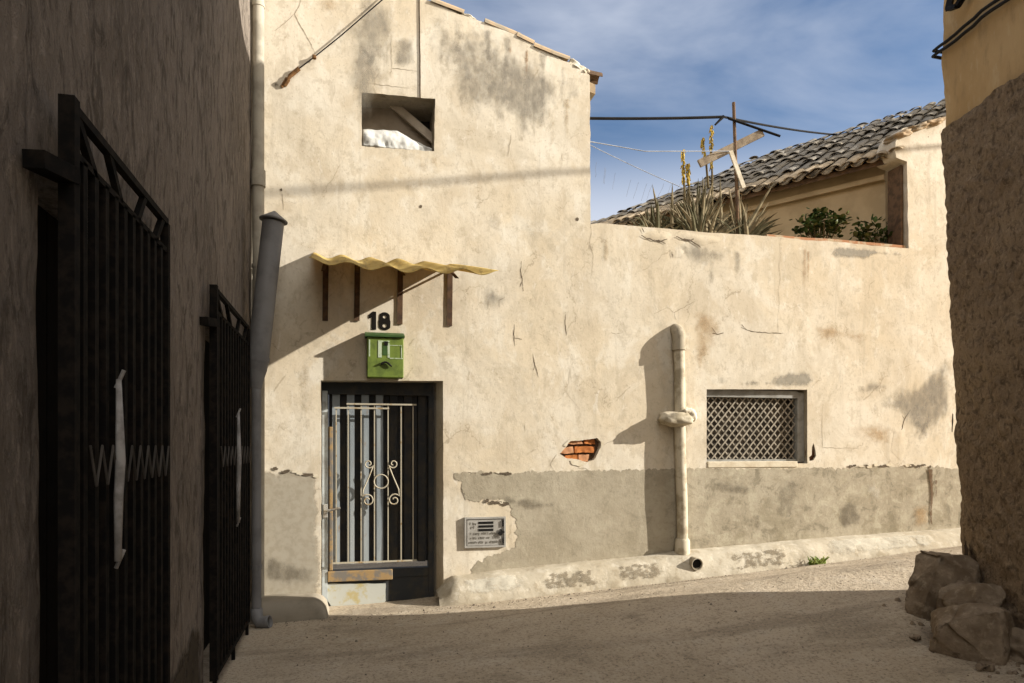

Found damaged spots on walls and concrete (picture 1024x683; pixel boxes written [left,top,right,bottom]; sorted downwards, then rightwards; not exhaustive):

damp [456,46,549,116]
crack [641,228,701,256]
damp [898,372,946,427]
flaking render [560,438,604,467]
flaking render [273,467,319,478]
spalling [546,570,597,589]
spalling [619,563,662,580]
spalling [732,550,791,570]